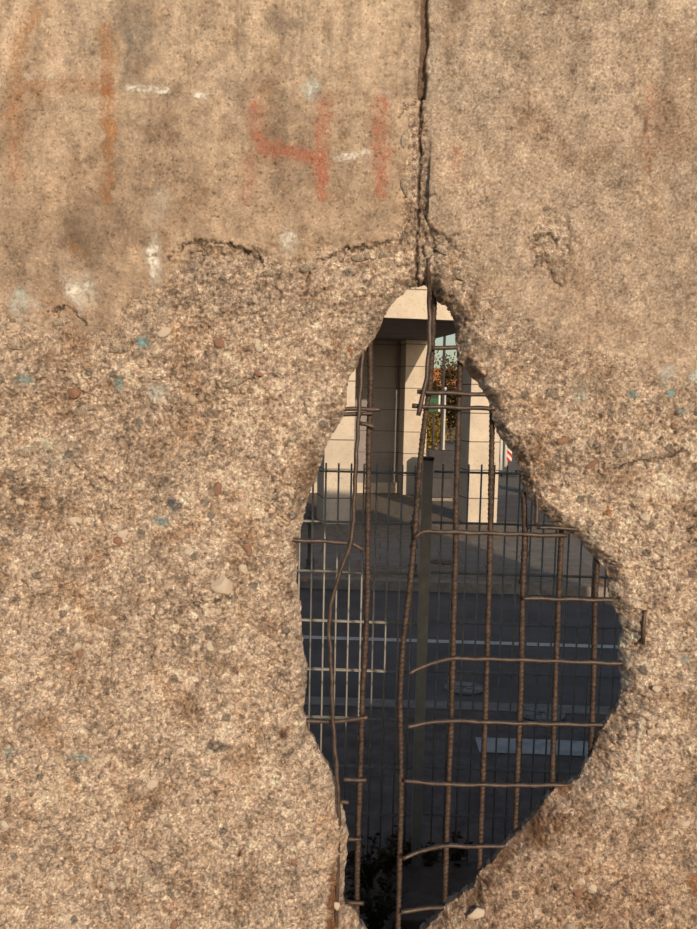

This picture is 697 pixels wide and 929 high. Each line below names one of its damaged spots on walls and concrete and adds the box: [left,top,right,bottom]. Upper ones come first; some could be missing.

spalling [0,107,420,929]
rust [327,873,339,929]
spalling [415,105,697,929]